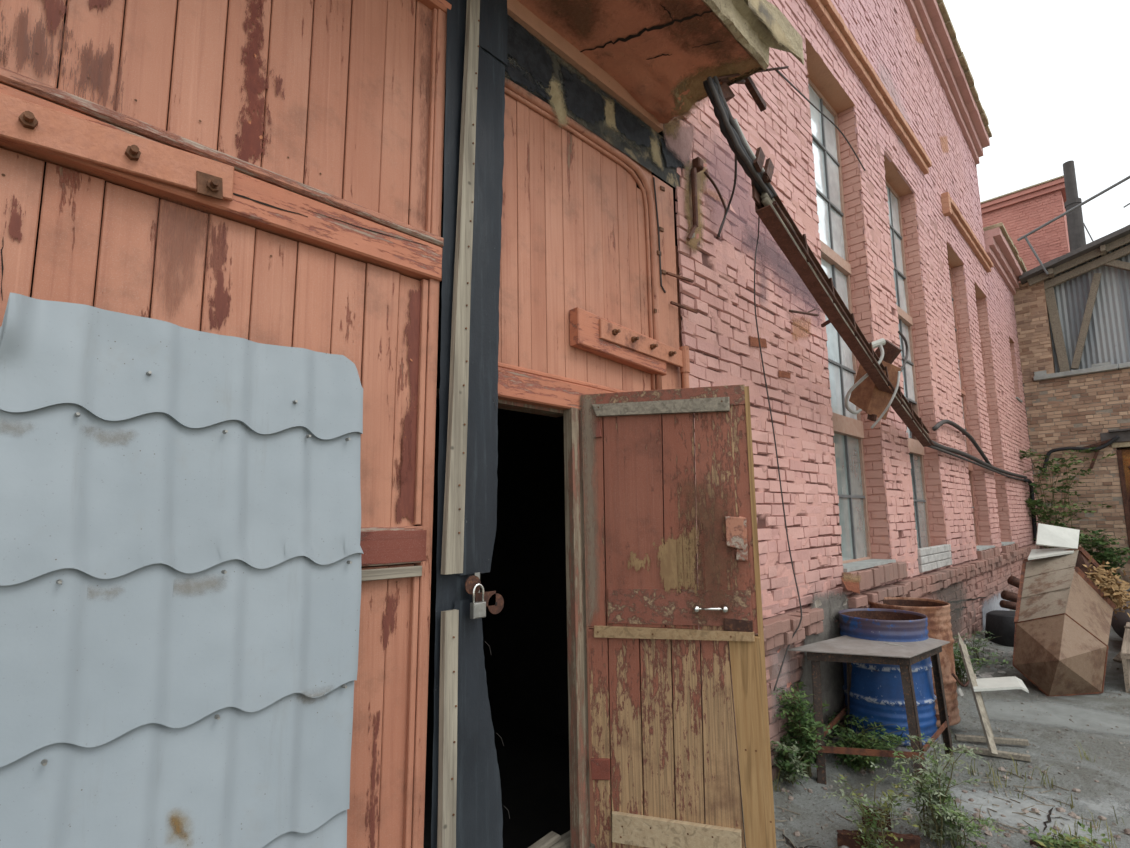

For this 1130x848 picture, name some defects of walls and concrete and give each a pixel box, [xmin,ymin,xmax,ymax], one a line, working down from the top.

peeling [0,0,124,111]
peeling [236,0,285,164]
crack [580,5,723,60]
peeling [206,222,233,330]
peeling [628,527,701,594]
peeling [381,592,398,650]
corrosion [171,818,186,837]
peeling [366,710,381,848]